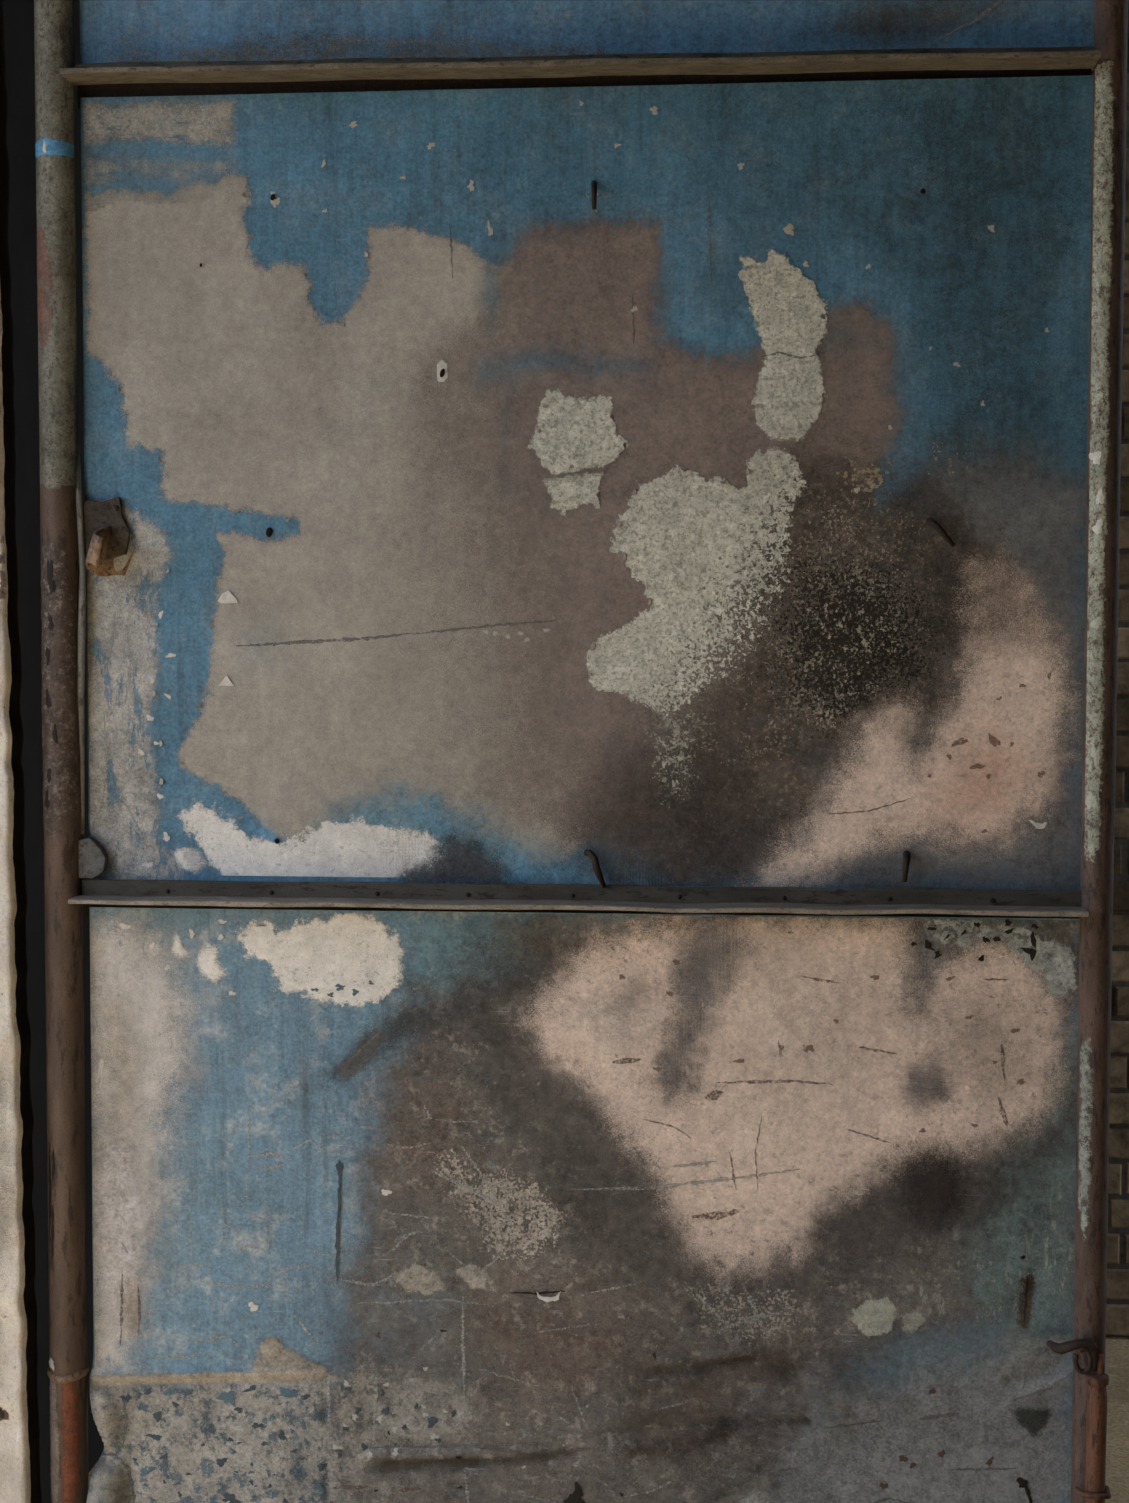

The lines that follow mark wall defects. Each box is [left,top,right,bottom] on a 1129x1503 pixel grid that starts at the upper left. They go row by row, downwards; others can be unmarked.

peeling [437,360,448,382]
peeling [528,388,630,516]
peeling [585,249,948,808]
peeling [218,591,238,604]
corrosion [49,1358,86,1503]